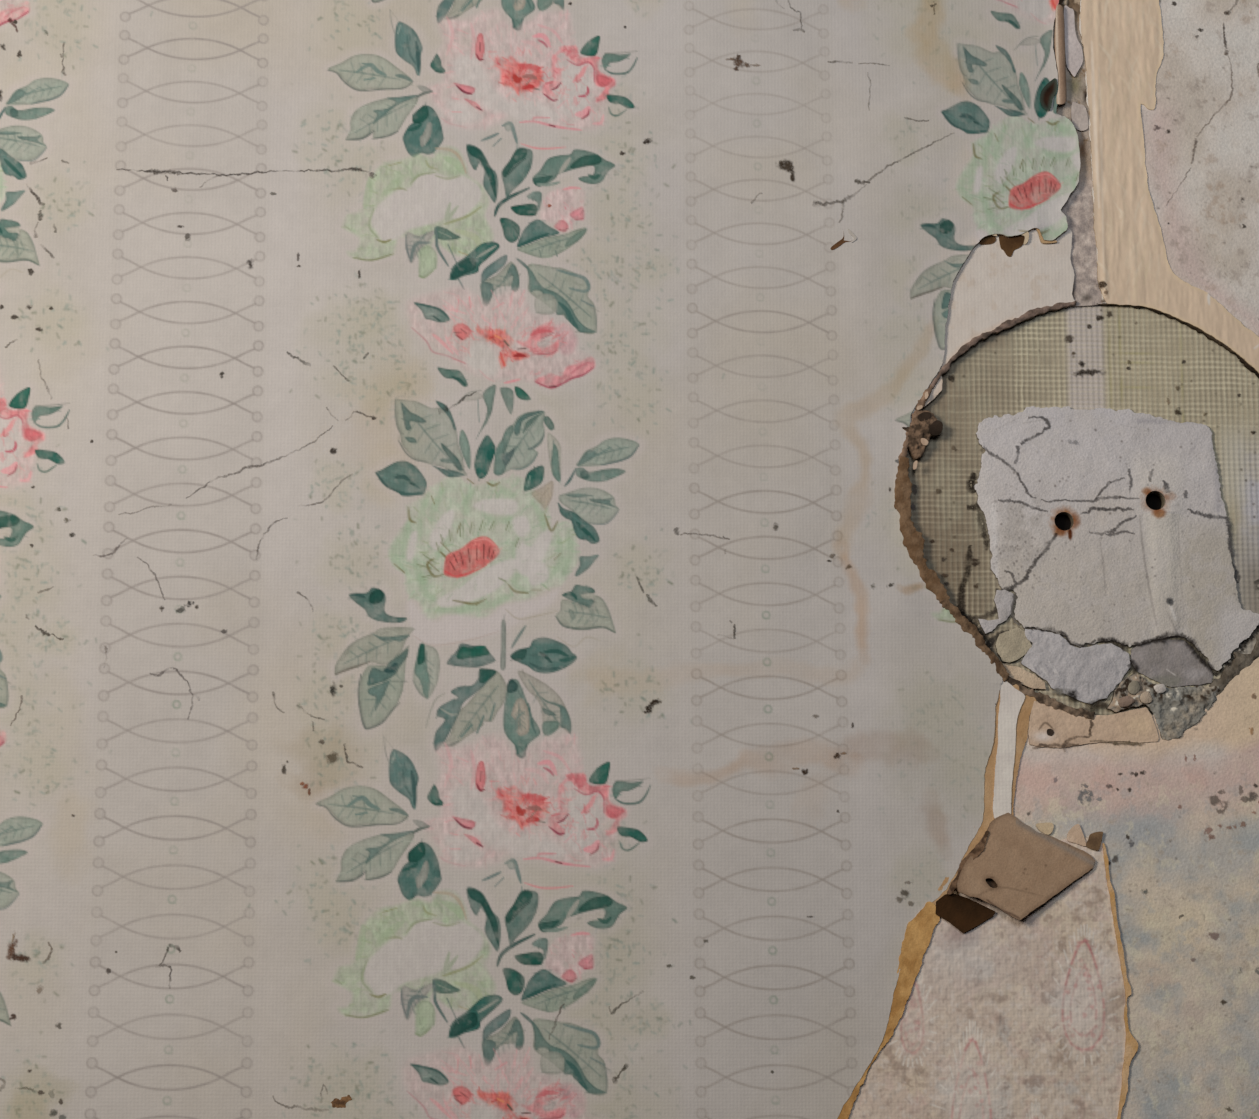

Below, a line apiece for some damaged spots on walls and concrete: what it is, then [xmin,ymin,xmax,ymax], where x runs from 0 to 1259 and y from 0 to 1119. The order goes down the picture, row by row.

peeling [779,161,795,181]
flaking render [1053,0,1111,329]
spalling [1066,335,1100,376]
crack [957,416,1259,676]
spalling [1053,688,1108,711]